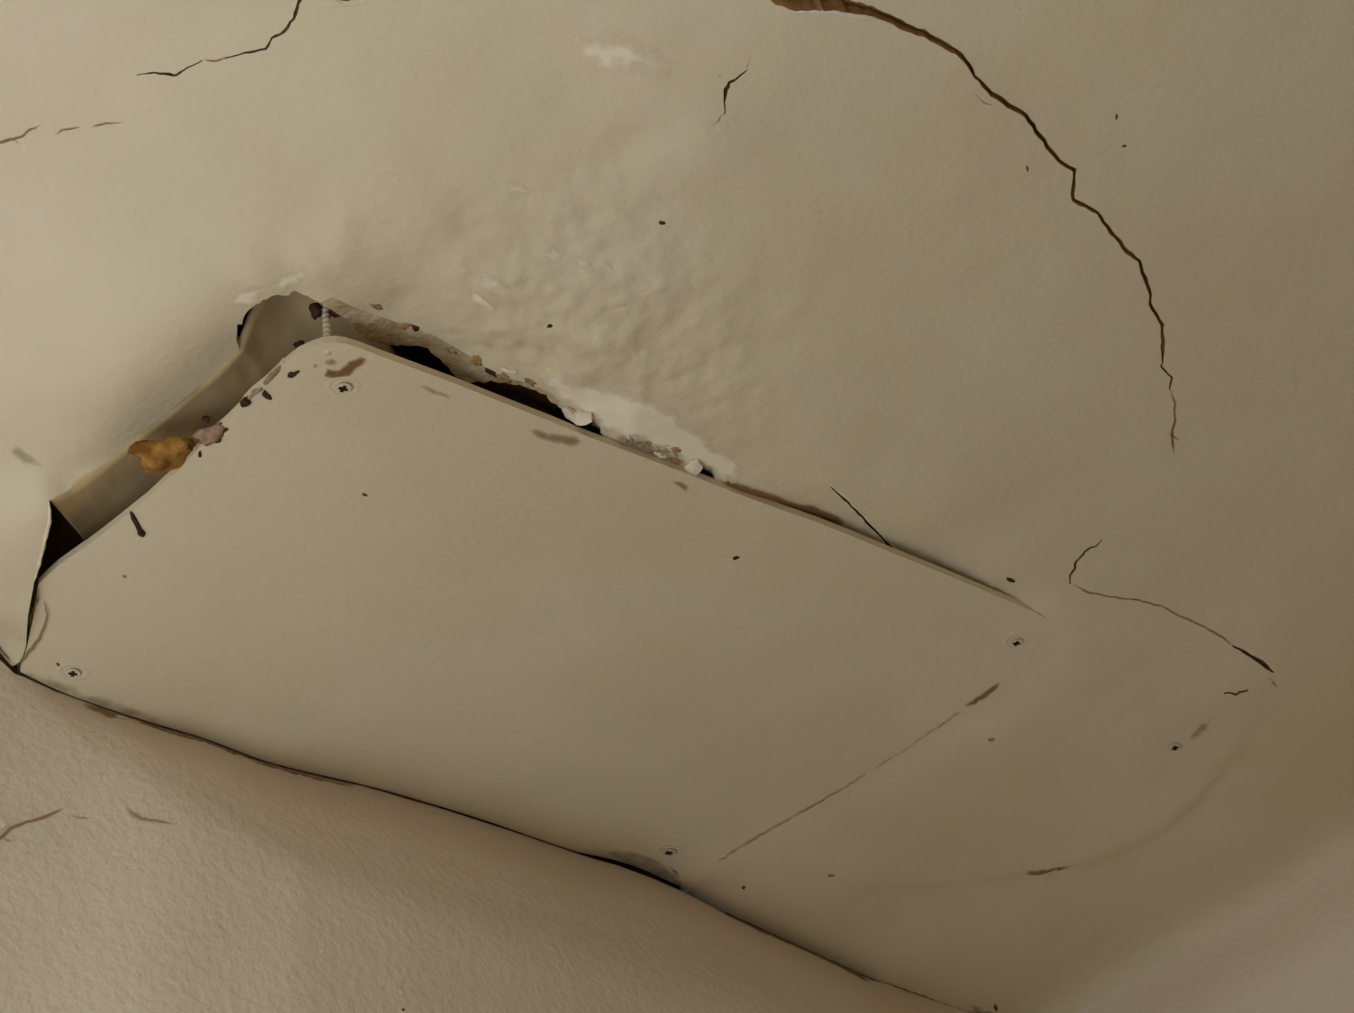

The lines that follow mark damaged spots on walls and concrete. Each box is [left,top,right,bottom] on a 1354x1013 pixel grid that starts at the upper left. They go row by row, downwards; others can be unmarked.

crack [137,0,372,77]
crack [723,69,748,112]
peeling [397,207,694,337]
crack [771,0,1176,447]
spalling [320,297,593,426]
spalling [619,440,703,475]
crack [1069,539,1275,696]
crack [0,595,680,890]